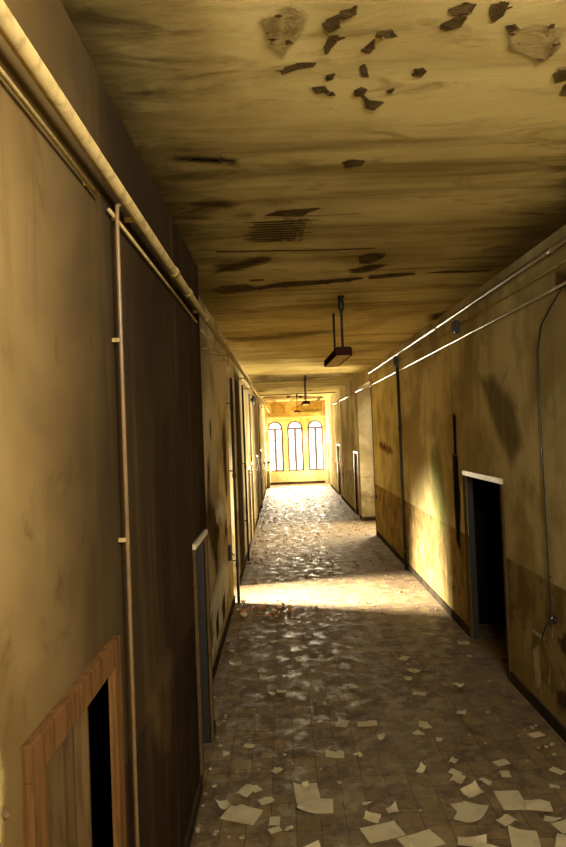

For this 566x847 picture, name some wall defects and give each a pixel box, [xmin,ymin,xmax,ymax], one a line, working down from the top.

flaking render [321,5,358,54]
flaking render [361,30,397,54]
flaking render [440,2,477,31]
flaking render [489,1,519,36]
flaking render [276,62,316,74]
flaking render [311,73,336,96]
flaking render [553,69,566,96]
flaking render [353,87,395,111]
peeling [0,749,10,847]